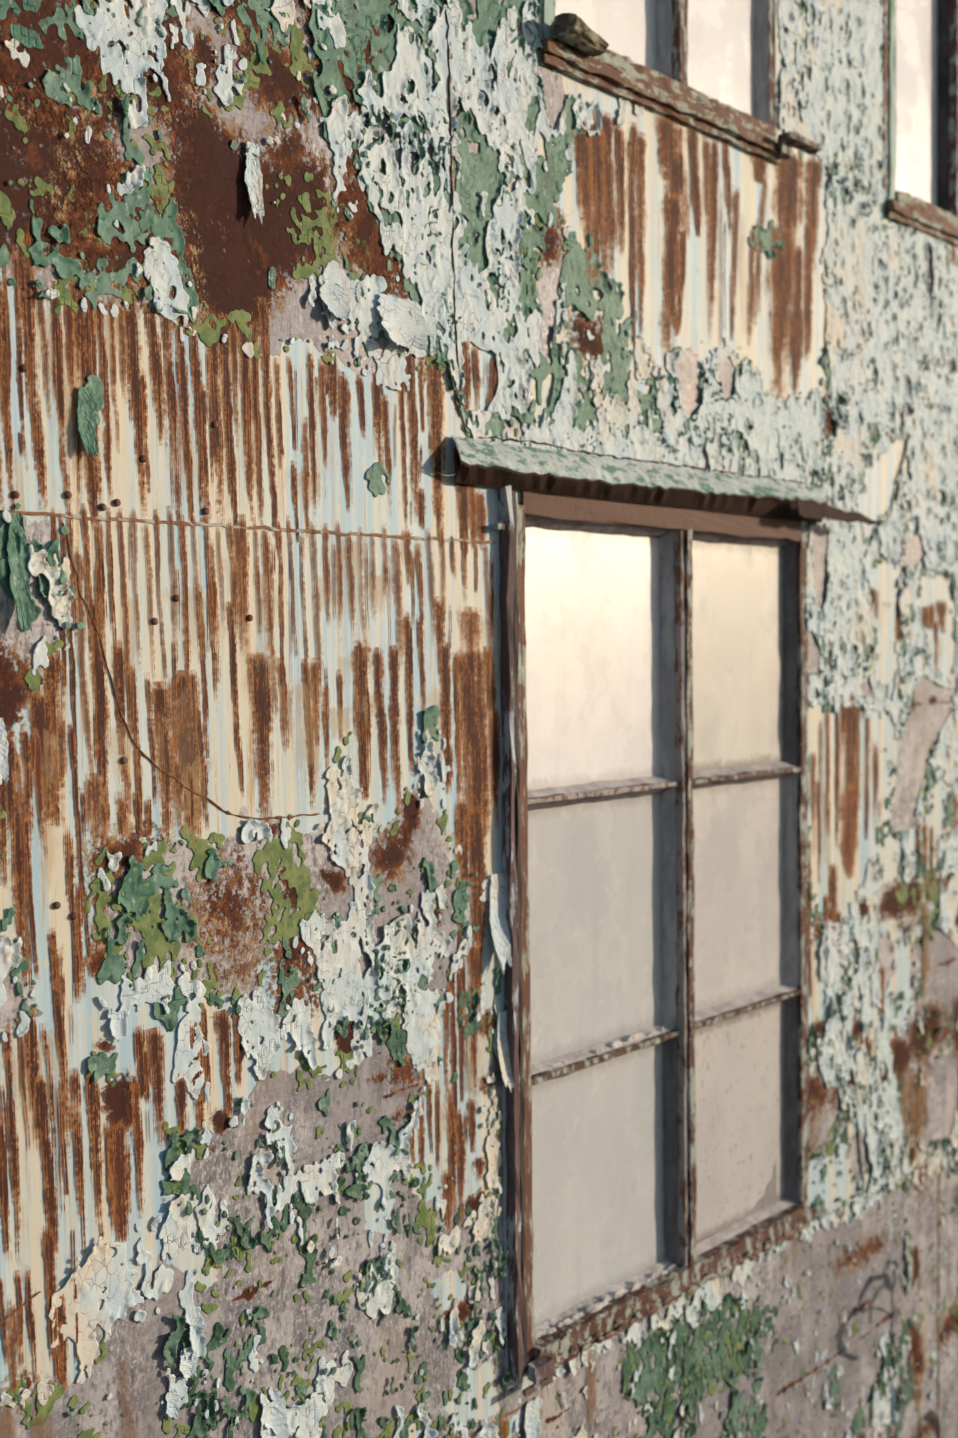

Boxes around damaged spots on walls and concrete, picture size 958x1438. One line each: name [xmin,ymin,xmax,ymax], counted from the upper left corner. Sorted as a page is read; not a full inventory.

peeling [22,42,104,151]
rust [535,110,822,401]
peeling [365,462,391,497]
peeling [0,503,85,746]
rust [0,0,501,1418]
peeling [441,753,450,783]
rust [807,694,882,1000]
rust [858,793,957,947]
peeling [85,1051,119,1087]
peeling [458,988,486,1040]
rust [808,965,958,1230]
rust [886,1303,957,1438]